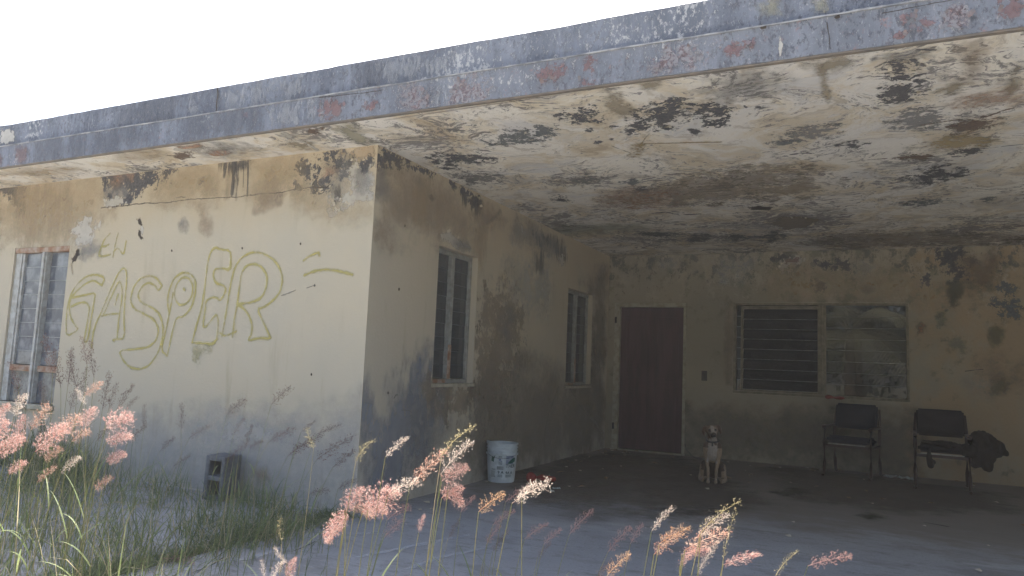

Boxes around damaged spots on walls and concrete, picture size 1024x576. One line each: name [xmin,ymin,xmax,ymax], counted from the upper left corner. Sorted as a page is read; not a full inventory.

water stain [102,168,178,206]
crack [101,184,330,208]
water stain [207,144,251,197]
water stain [289,125,366,204]
water stain [377,73,763,215]
water stain [851,49,1023,208]
water stain [636,230,1024,320]